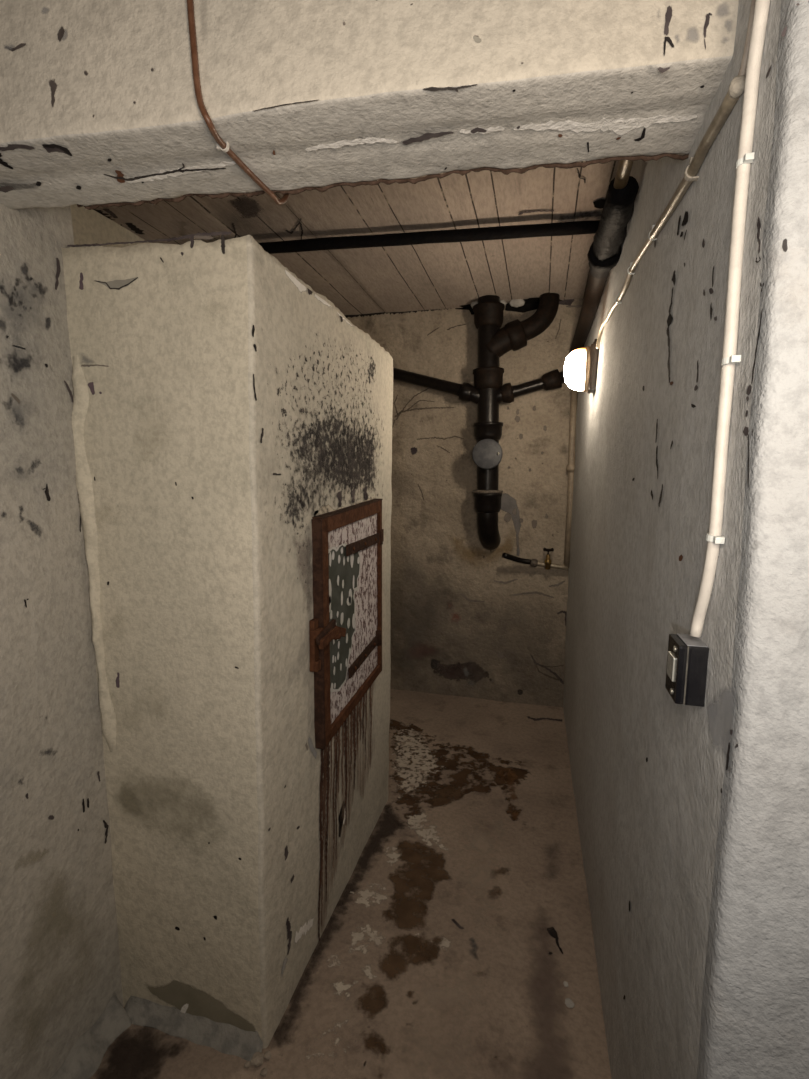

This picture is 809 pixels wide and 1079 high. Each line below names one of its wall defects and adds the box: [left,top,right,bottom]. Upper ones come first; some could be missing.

leakage [9,356,31,372]
leakage [0,263,45,327]
corrosion [318,684,373,941]
leakage [358,841,450,1017]